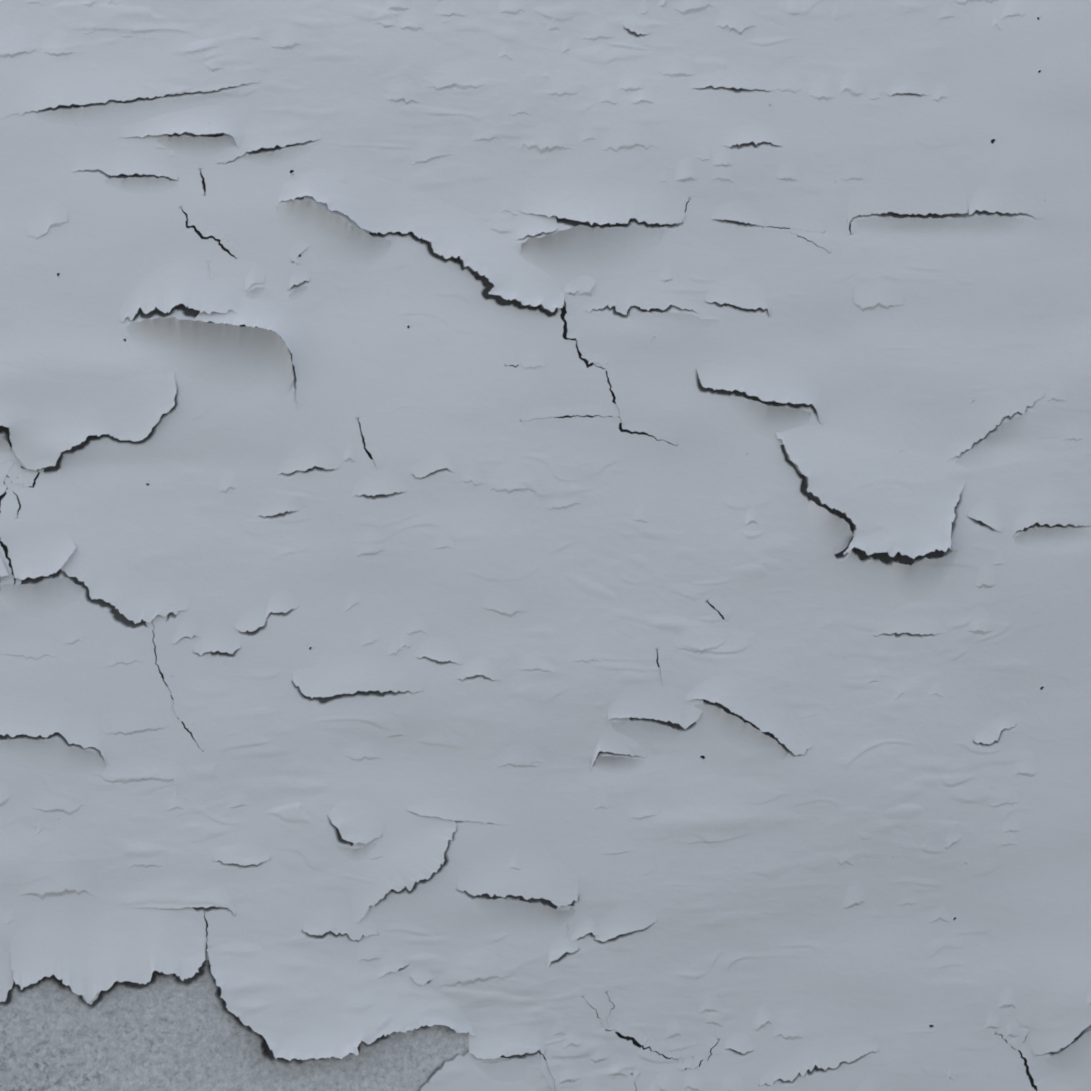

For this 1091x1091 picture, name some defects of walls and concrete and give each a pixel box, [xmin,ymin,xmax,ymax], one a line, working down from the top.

peeling [837,142,1045,249]
peeling [0,47,801,655]
crack [506,290,679,450]
peeling [697,354,972,637]
peeling [968,483,1091,549]
peeling [0,691,189,800]
peeling [293,654,422,698]
peeling [586,595,814,775]
flaking render [0,853,569,1091]
peeling [303,797,514,941]
peeling [457,839,656,969]
crack [984,986,1047,1091]